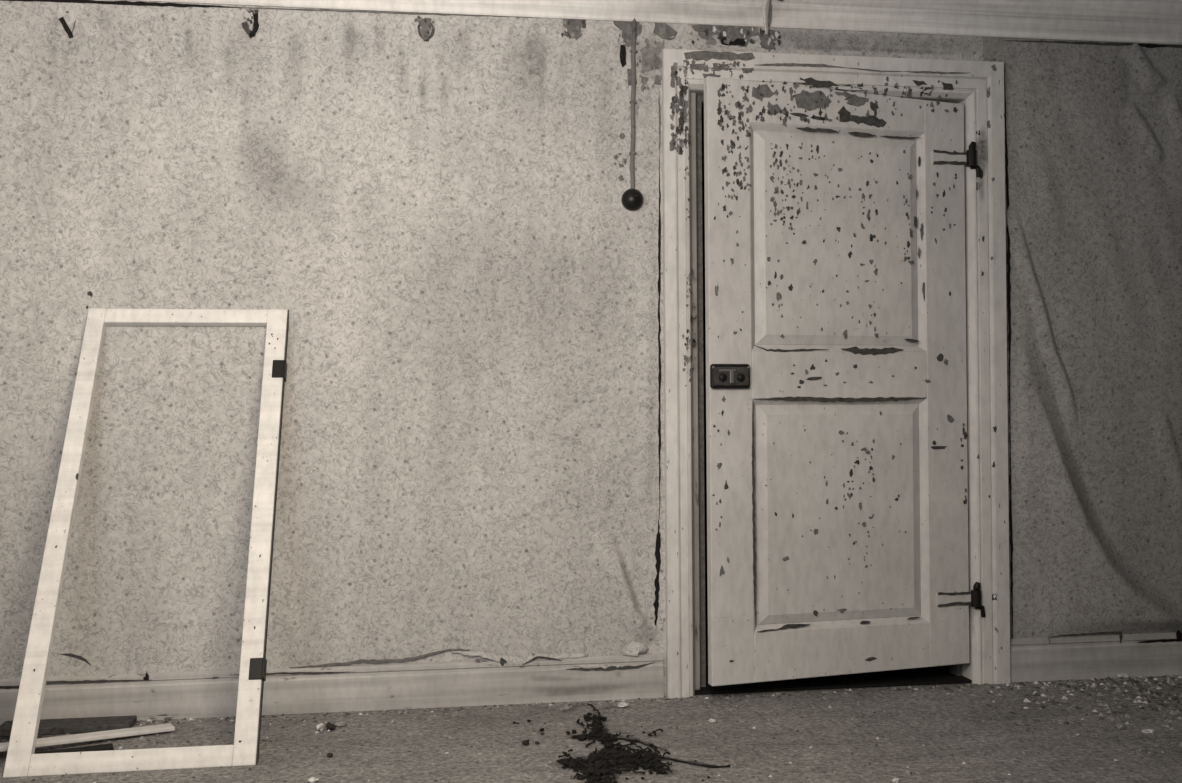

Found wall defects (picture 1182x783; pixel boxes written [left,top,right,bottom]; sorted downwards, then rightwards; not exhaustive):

flaking render [561,19,586,40]
peeling [613,0,958,282]
peeling [682,268,696,386]
peeling [765,257,793,318]
peeling [840,290,887,339]
peeling [791,359,846,388]
peeling [931,414,968,470]
peeling [824,430,875,568]